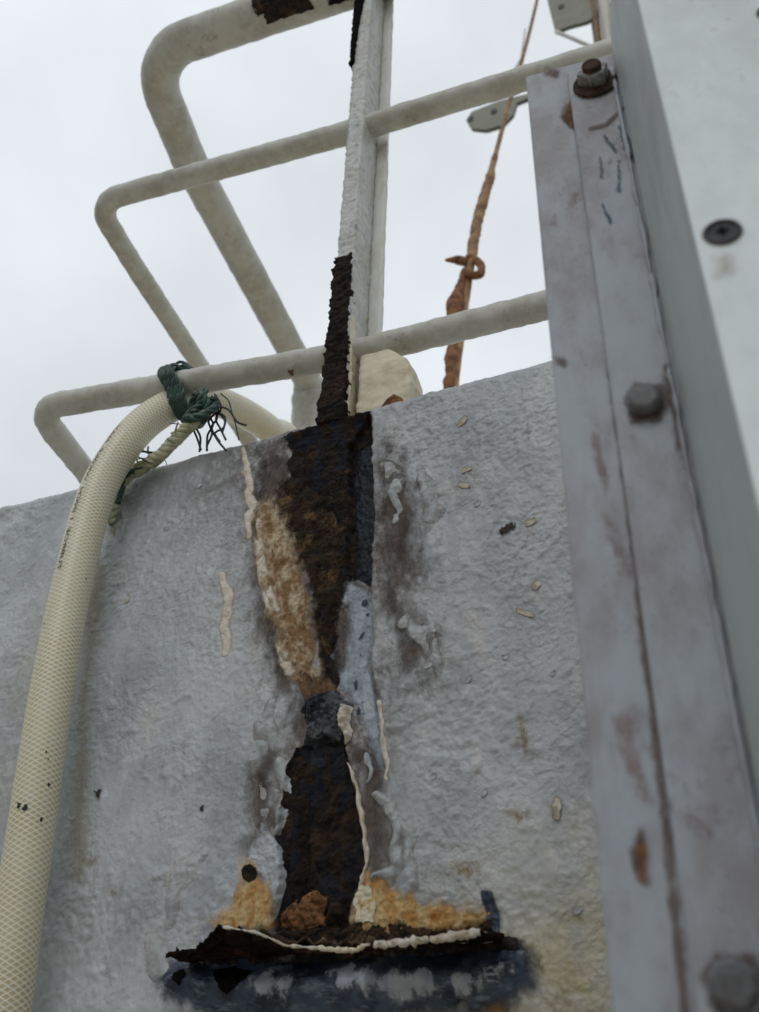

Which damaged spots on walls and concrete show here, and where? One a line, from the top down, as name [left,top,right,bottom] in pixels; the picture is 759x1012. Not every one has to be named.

rust [251,0,314,24]
rust [253,252,403,697]
peeling [331,441,385,773]
peeling [208,829,287,930]
peeling [347,762,371,885]
rust [273,741,493,943]
peeling [171,969,186,986]
peeling [213,965,253,994]
peeling [422,949,509,976]